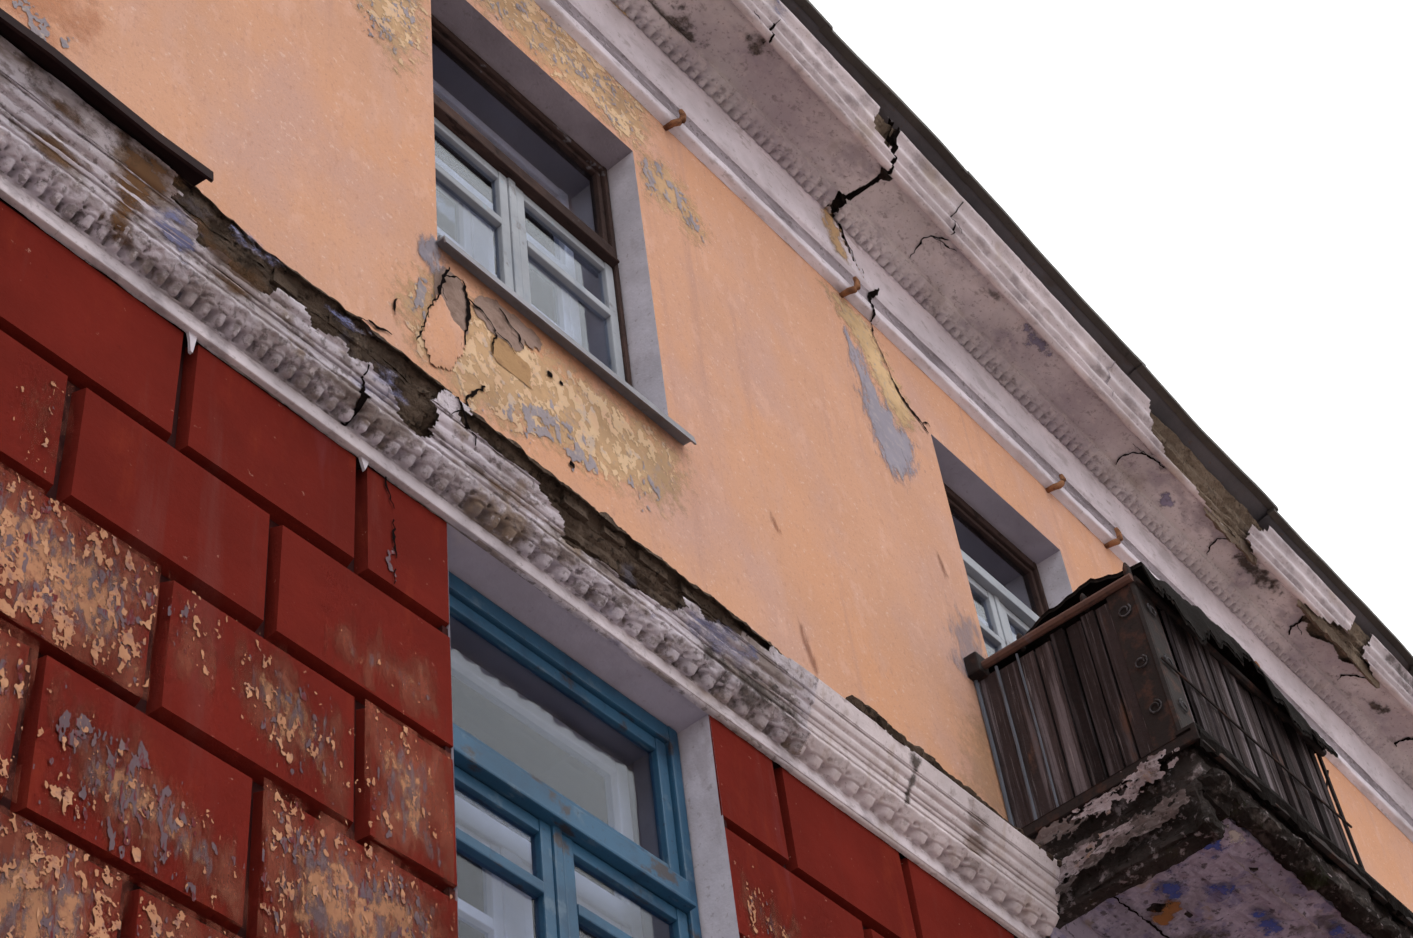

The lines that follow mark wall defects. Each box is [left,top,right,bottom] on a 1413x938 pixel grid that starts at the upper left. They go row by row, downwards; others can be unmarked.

peeling [357,0,431,75]
peeling [477,0,706,244]
crack [340,364,370,426]
crack [385,476,397,584]
crack [358,267,524,446]
flaking render [171,176,782,655]
crack [827,118,930,433]
flaking render [1150,412,1264,565]
peeling [0,467,454,938]
flaking render [1296,599,1380,688]
spalling [845,695,1410,938]